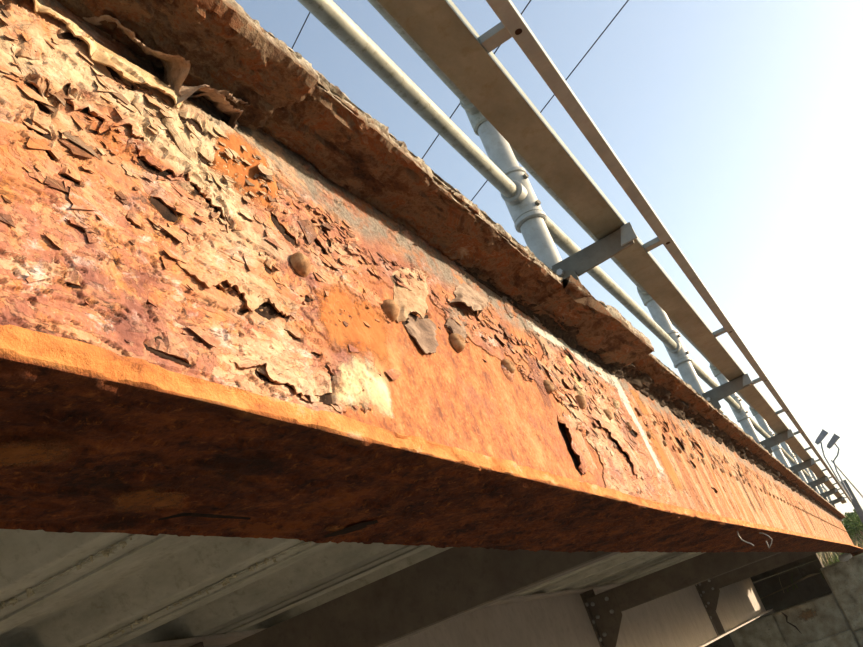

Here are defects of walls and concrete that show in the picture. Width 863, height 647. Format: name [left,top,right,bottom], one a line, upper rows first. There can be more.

peeling [11,0,309,319]
peeling [311,216,333,256]
peeling [230,286,390,405]
peeling [391,267,488,354]
corrosion [0,441,74,465]
peeling [565,387,651,479]
corrosion [441,253,849,540]
peeling [660,411,704,468]
corrosion [113,489,186,511]